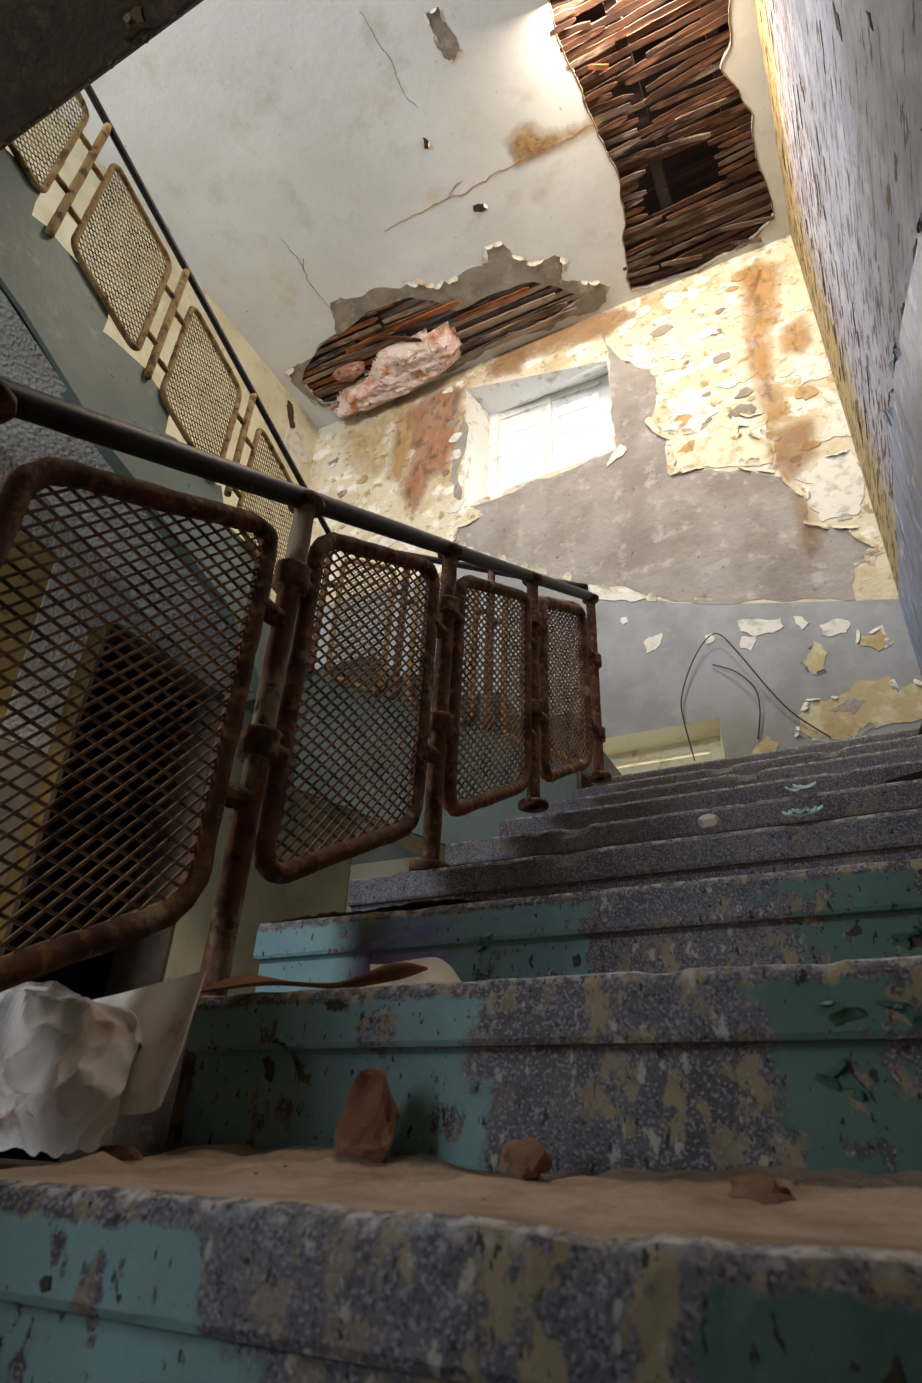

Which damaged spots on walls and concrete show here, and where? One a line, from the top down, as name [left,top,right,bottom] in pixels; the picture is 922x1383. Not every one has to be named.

peeling [423,7,463,64]
peeling [819,1,842,74]
crack [385,125,590,231]
peeling [913,207,922,264]
spalling [281,240,610,417]
peeling [442,74,894,675]
leakage [743,264,810,473]
peeling [884,302,905,429]
peeling [318,458,369,504]
leakage [350,390,460,508]
peeling [378,537,404,551]
peeling [752,675,922,754]